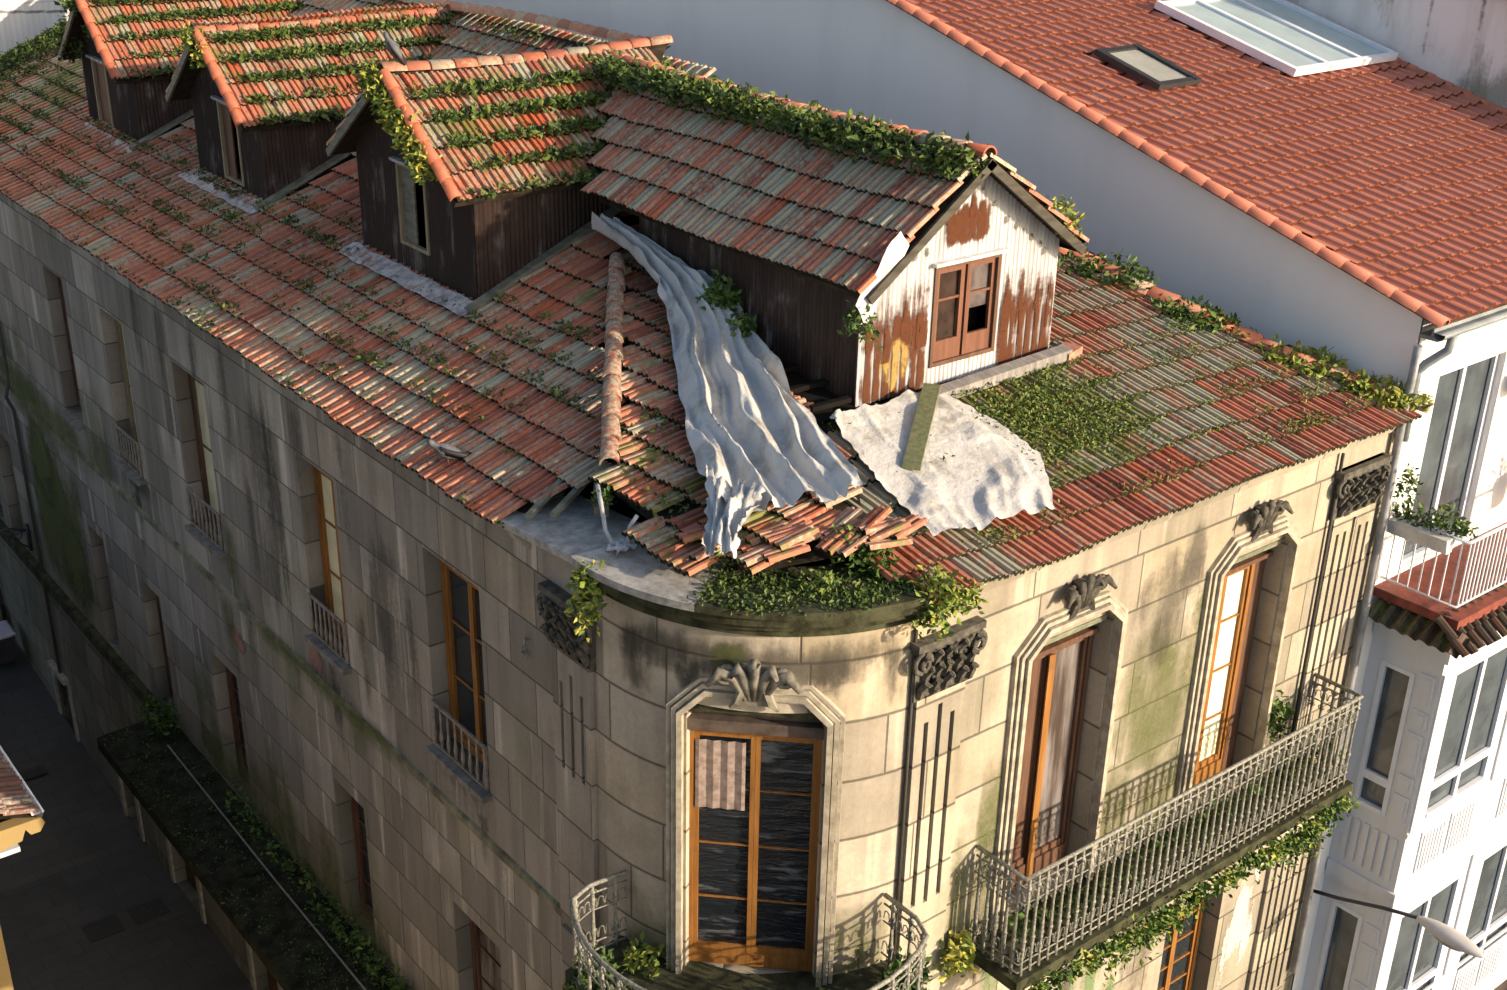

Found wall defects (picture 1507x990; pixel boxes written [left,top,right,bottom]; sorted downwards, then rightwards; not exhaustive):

spalling [982,184,1046,255]
spalling [674,505,928,570]
leakage [624,626,899,687]